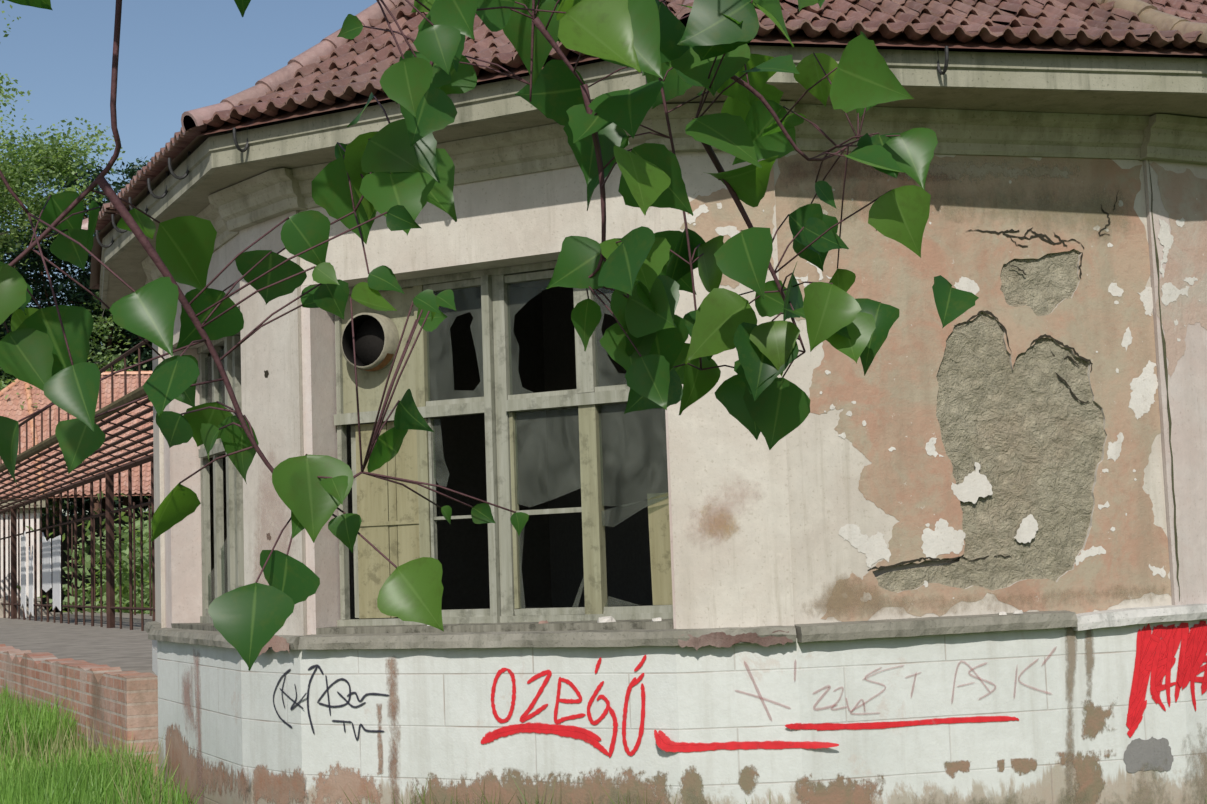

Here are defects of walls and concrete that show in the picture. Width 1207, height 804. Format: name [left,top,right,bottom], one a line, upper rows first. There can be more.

crack [968,193,1118,278]
peeling [680,151,1207,622]
crack [954,310,1093,403]
crack [1148,160,1180,602]
peeling [165,724,382,804]
peeling [411,766,707,804]
peeling [739,766,759,794]
peeling [795,774,884,804]
peeling [944,760,970,778]
peeling [997,758,1037,776]